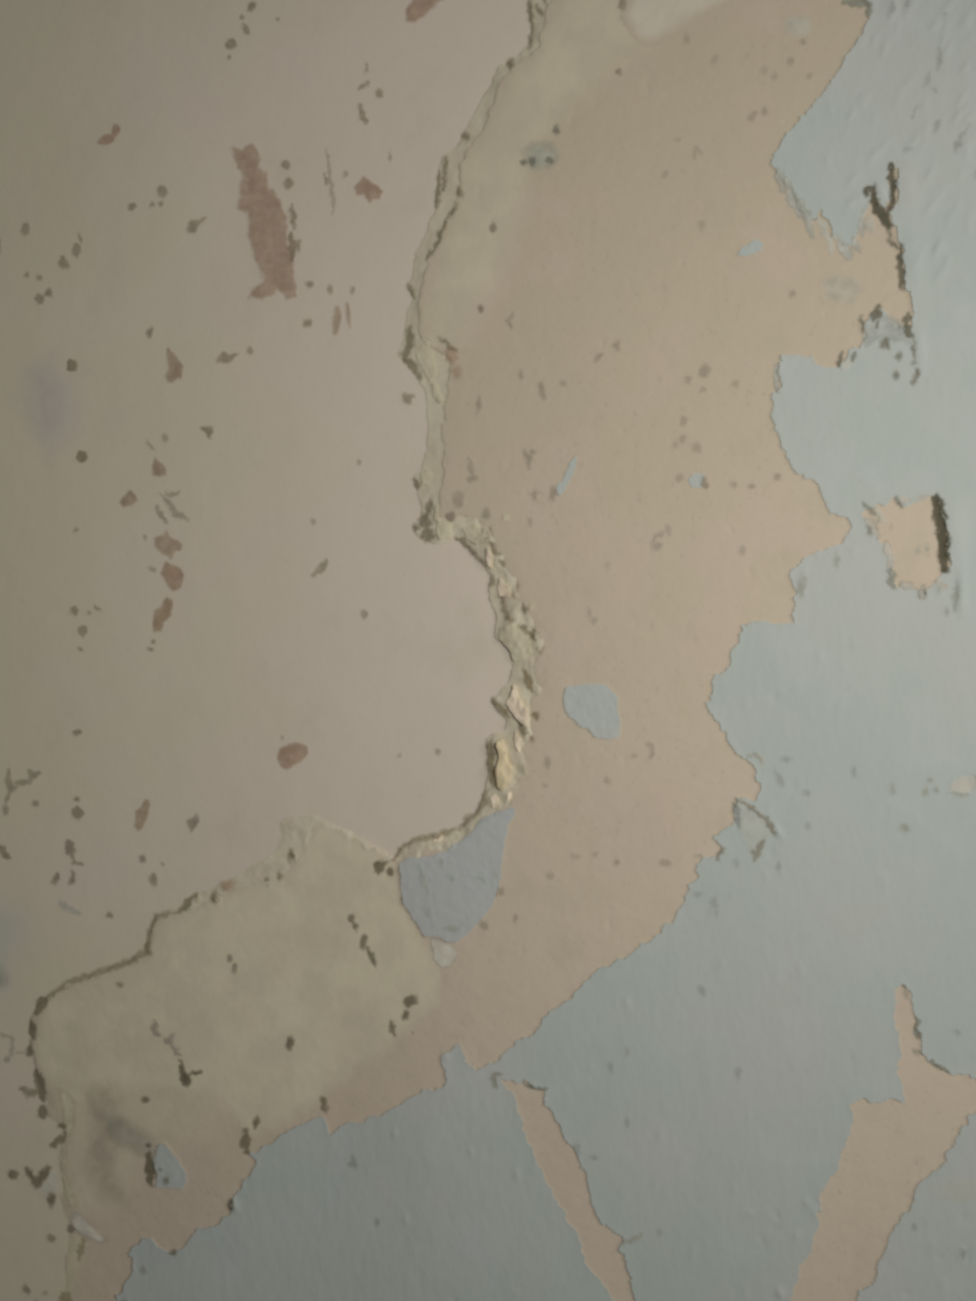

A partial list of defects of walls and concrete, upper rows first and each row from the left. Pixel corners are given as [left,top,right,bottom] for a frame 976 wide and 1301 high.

spalling [746,104,770,123]
spalling [650,522,674,553]
peeling [861,496,951,591]
flaking render [0,0,553,1301]
spalling [586,606,600,626]
peeling [735,799,779,862]
peeling [501,1079,635,1301]
peeling [791,984,976,1301]